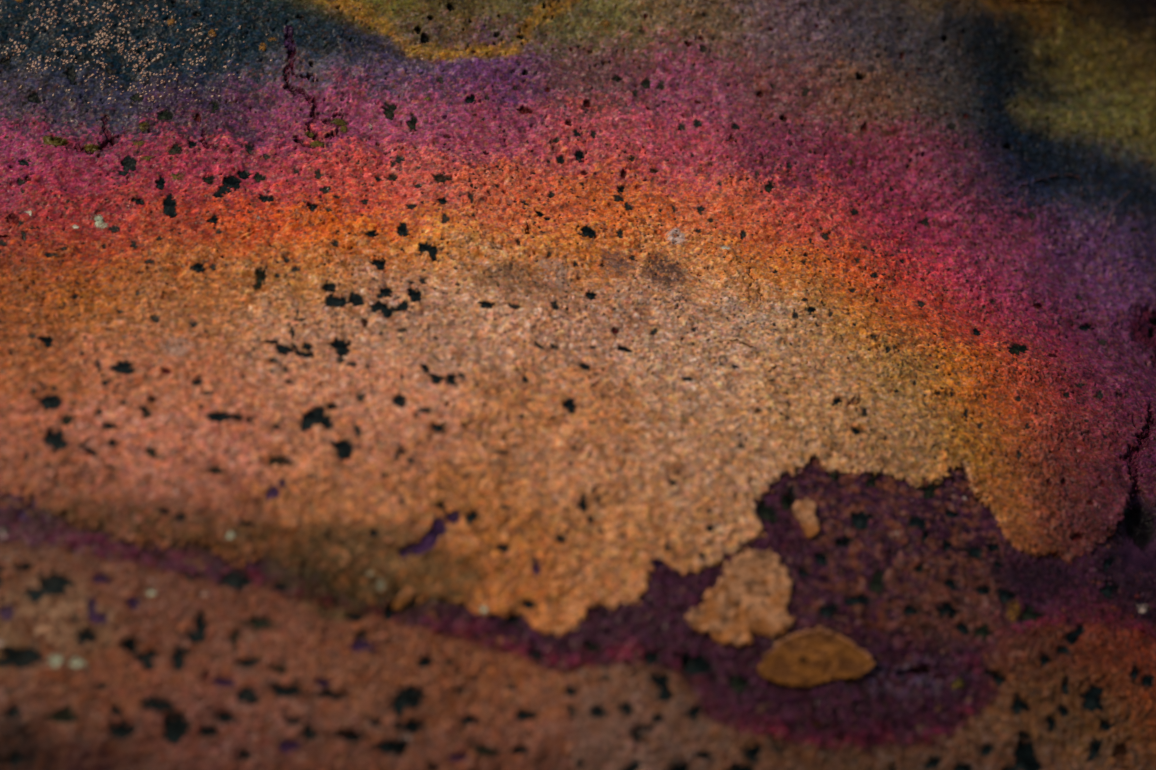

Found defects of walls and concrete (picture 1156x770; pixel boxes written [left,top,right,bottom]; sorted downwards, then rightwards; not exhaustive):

peeling [0,0,535,559]
peeling [846,110,1000,362]
crack [1124,413,1154,488]